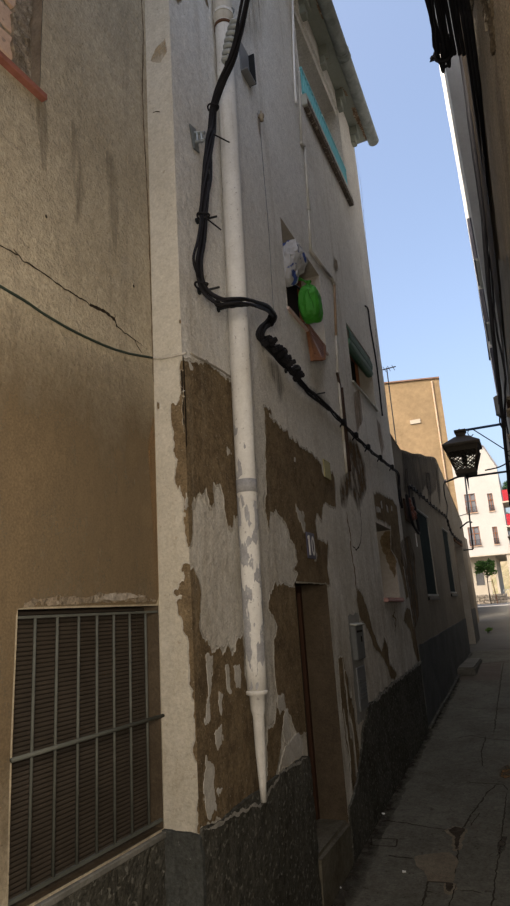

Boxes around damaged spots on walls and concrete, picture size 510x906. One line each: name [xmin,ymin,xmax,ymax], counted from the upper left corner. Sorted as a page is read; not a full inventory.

crack [0,0,160,382]
peeling [157,357,336,834]
peeling [356,586,397,681]
peeling [373,491,421,663]
crack [388,663,508,906]